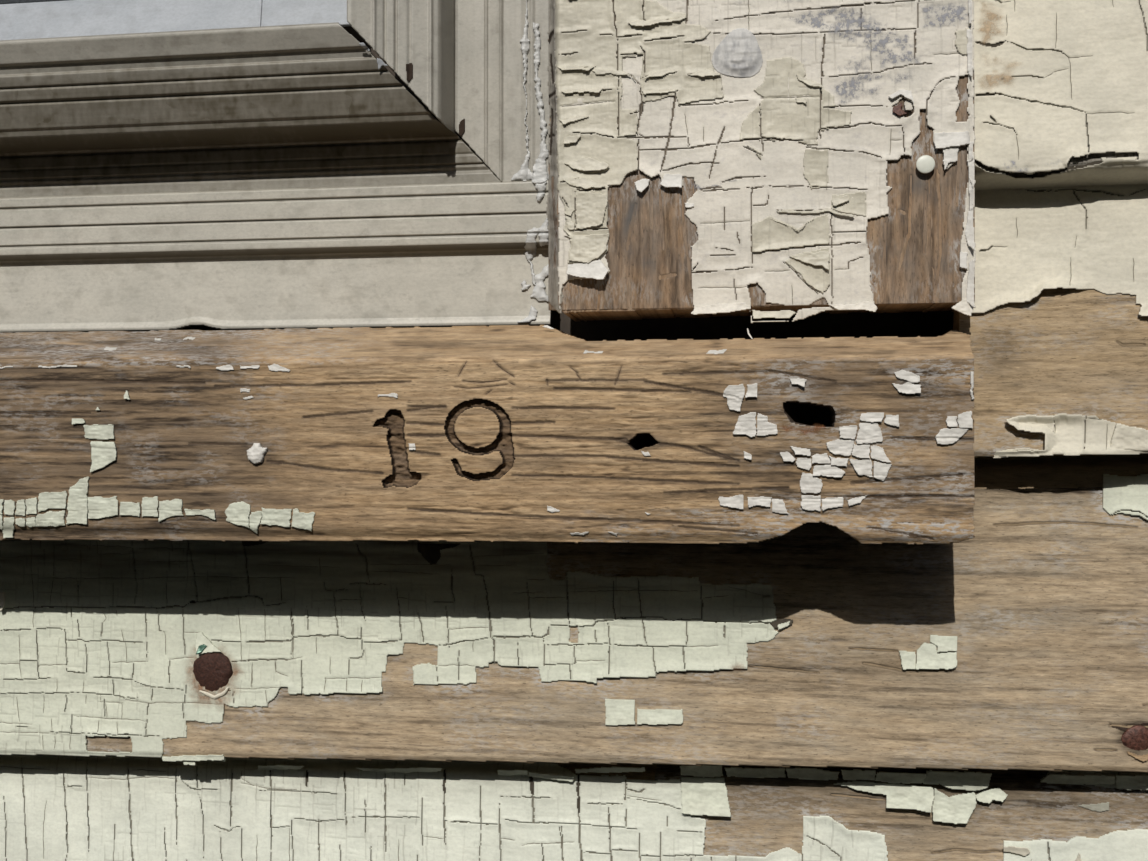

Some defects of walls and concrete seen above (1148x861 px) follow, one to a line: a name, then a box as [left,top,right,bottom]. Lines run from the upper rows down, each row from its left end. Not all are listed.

peeling [86,736,132,757]
peeling [0,419,315,546]
peeling [216,364,290,372]
crack [0,541,774,861]
peeling [162,413,1148,861]
peeling [548,0,796,319]
peeling [723,383,778,437]
peeling [740,0,1148,458]